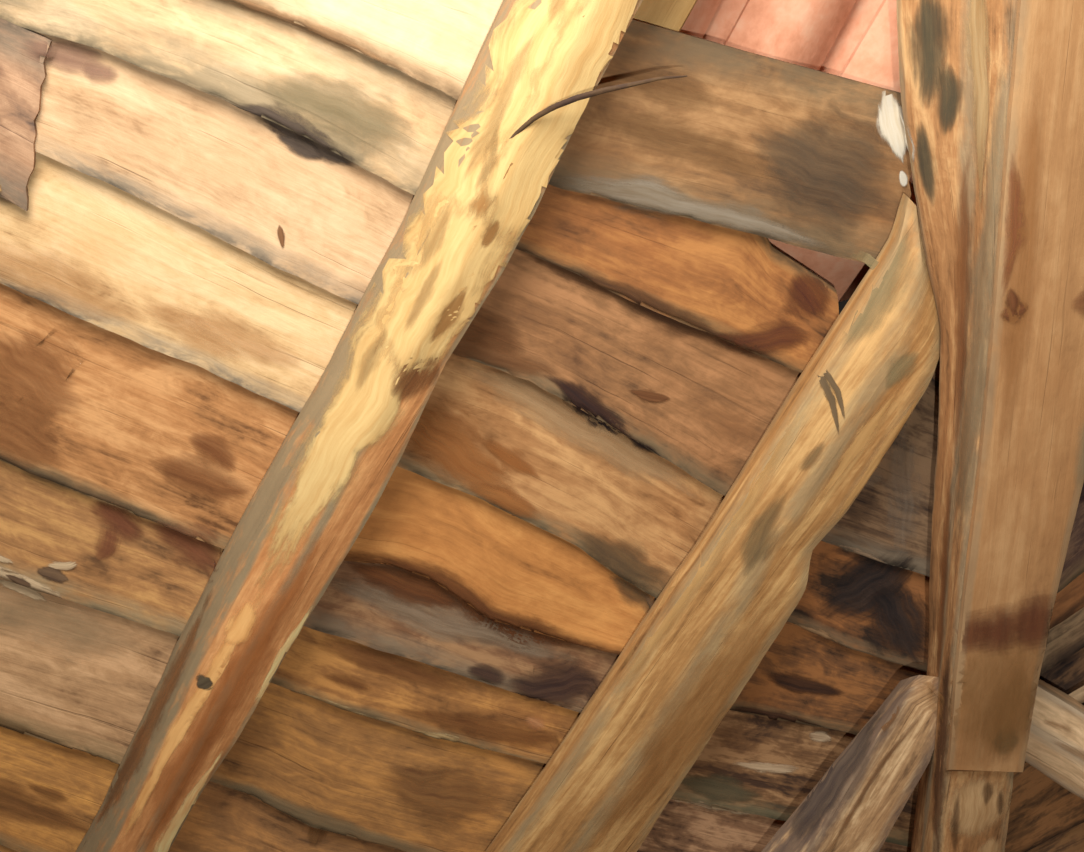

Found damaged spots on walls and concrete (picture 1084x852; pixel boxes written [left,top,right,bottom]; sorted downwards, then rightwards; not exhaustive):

water stain [238,82,399,165]
water stain [917,128,934,198]
water stain [912,0,959,131]
water stain [453,316,673,476]
water stain [827,558,925,659]
water stain [933,659,949,852]